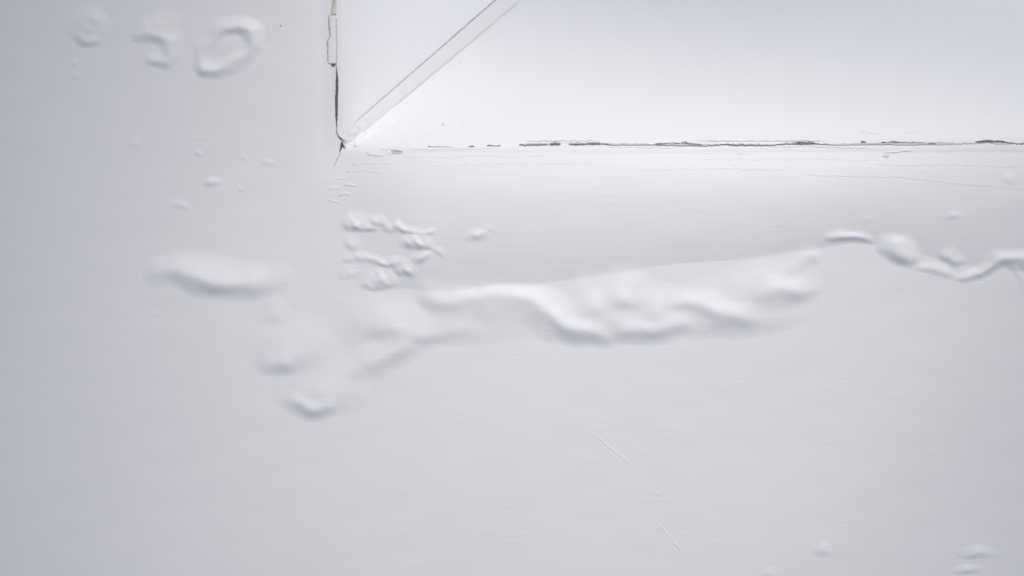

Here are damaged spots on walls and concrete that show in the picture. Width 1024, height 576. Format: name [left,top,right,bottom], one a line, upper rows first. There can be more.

crack [331,0,522,166]
crack [380,139,1024,189]